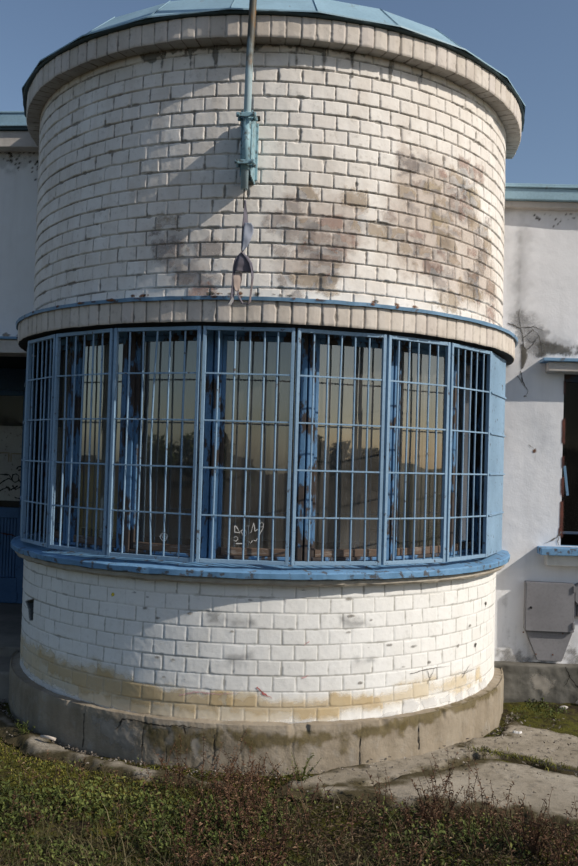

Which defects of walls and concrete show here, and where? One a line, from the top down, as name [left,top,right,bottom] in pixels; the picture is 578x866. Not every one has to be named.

leakage [536,342,578,357]
leakage [20,637,487,758]
crack [116,718,215,766]